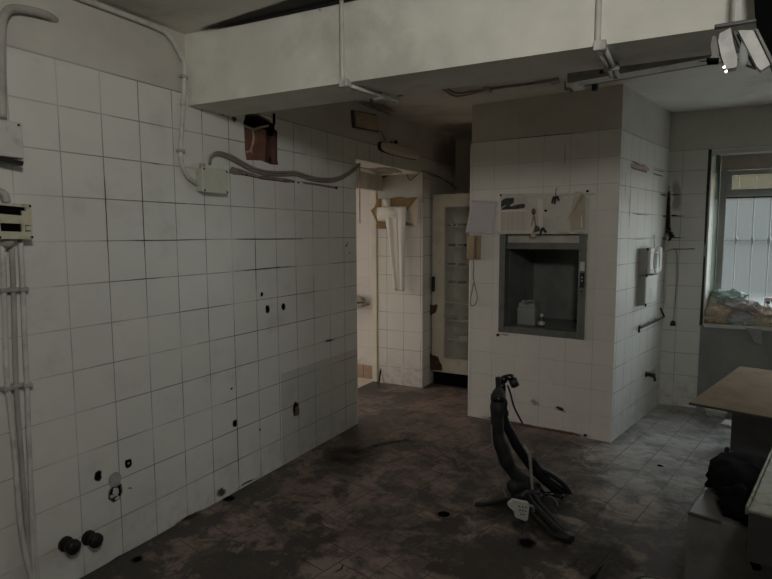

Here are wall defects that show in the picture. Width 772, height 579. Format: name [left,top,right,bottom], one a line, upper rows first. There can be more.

rust [430,353,442,371]